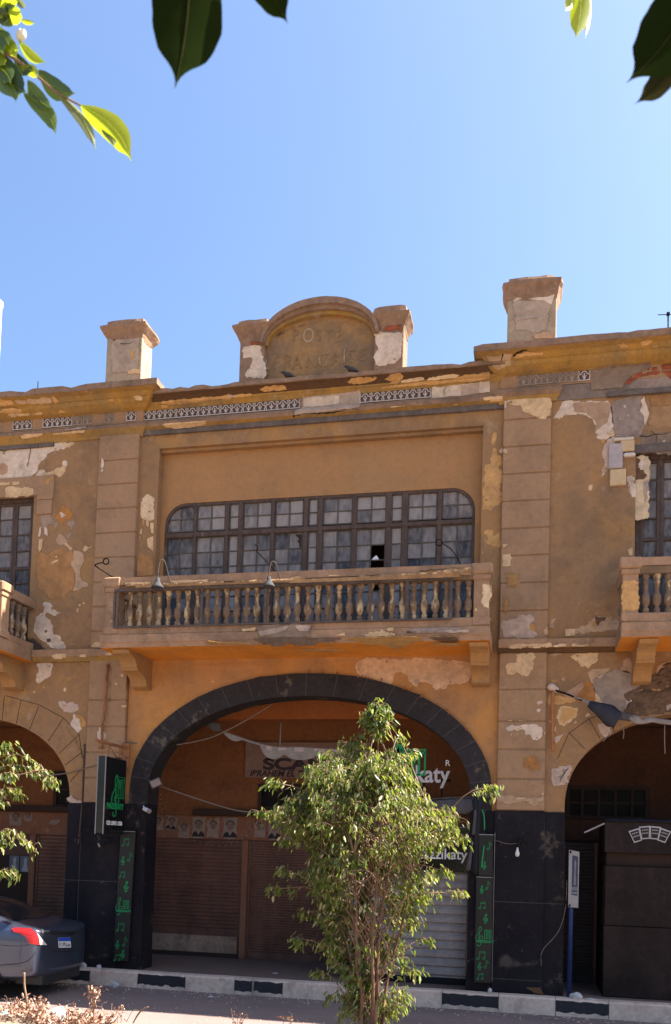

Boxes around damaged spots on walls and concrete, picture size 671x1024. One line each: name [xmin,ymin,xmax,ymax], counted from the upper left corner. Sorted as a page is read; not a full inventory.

peeling [512,295,554,339]
peeling [161,342,287,408]
peeling [294,324,671,521]
peeling [0,425,86,498]
spalling [123,494,472,588]
peeling [33,506,111,693]
peeling [205,624,471,690]
spalling [500,580,671,743]
peeling [58,688,106,740]